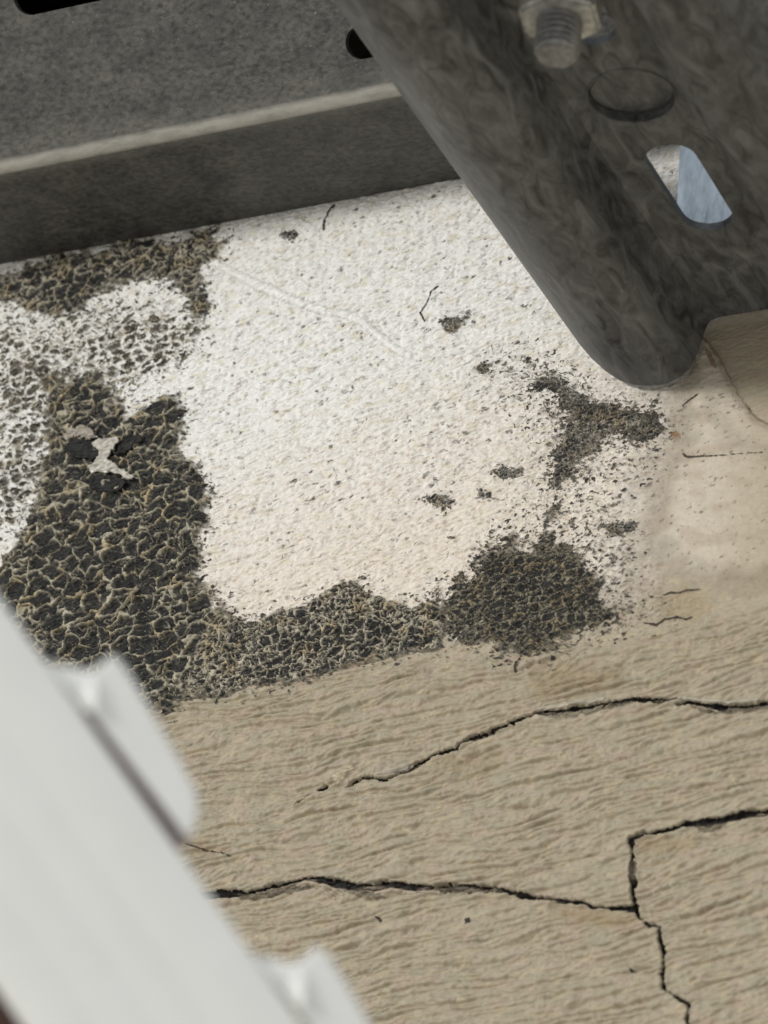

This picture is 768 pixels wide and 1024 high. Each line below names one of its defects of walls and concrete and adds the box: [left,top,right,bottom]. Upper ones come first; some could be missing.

water stain [0,223,686,724]
crack [294,695,768,805]
crack [207,809,768,1024]